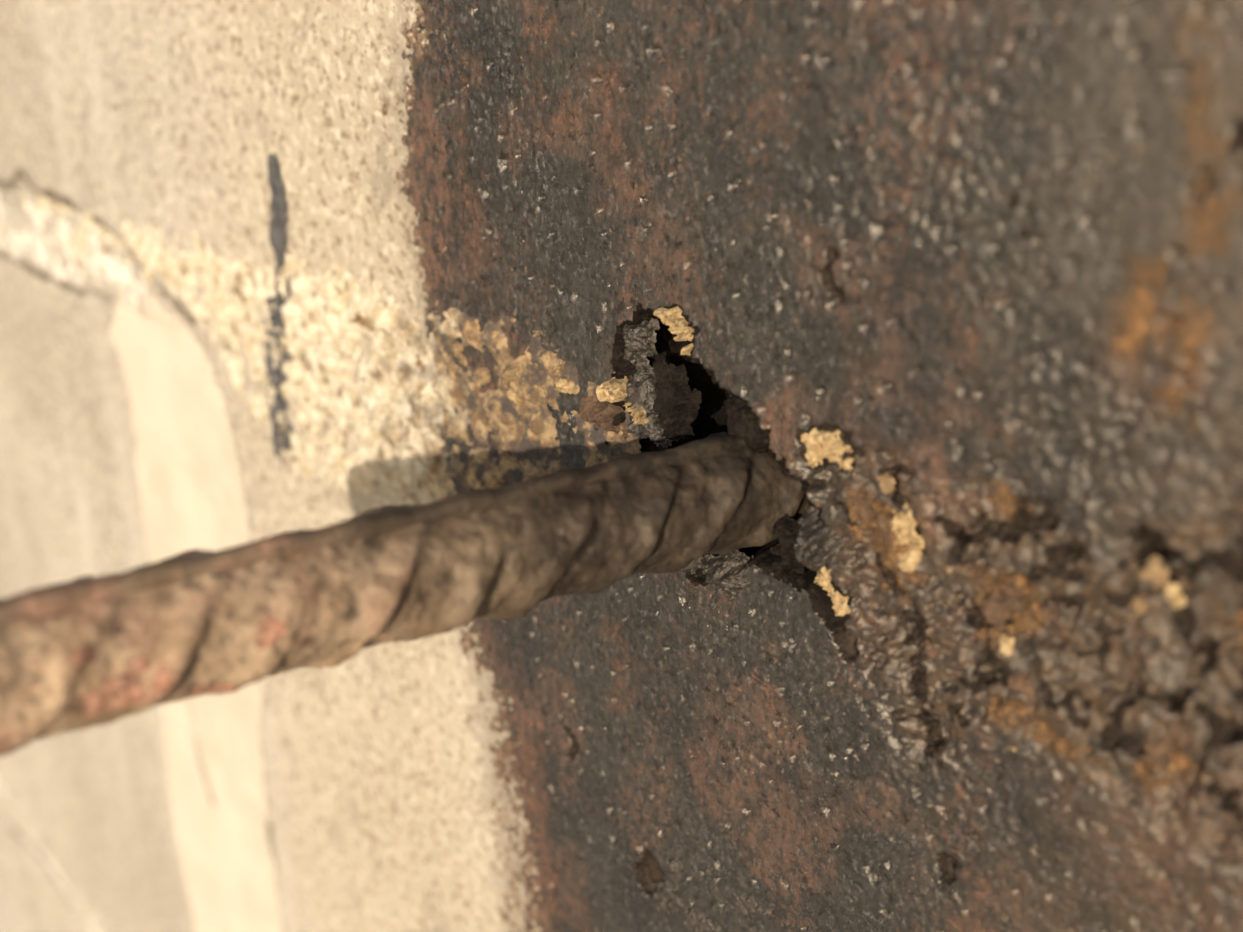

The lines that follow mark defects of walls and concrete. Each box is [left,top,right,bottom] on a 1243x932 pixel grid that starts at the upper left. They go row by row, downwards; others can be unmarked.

spalling [23,192,865,663]
rust [847,488,921,591]
rust [960,561,1044,647]
spalling [875,464,1243,838]
rust [67,655,175,717]
rust [189,683,239,694]
spalling [563,726,579,761]
rust [988,697,1091,760]
rust [1135,752,1194,793]
spalling [937,853,958,886]